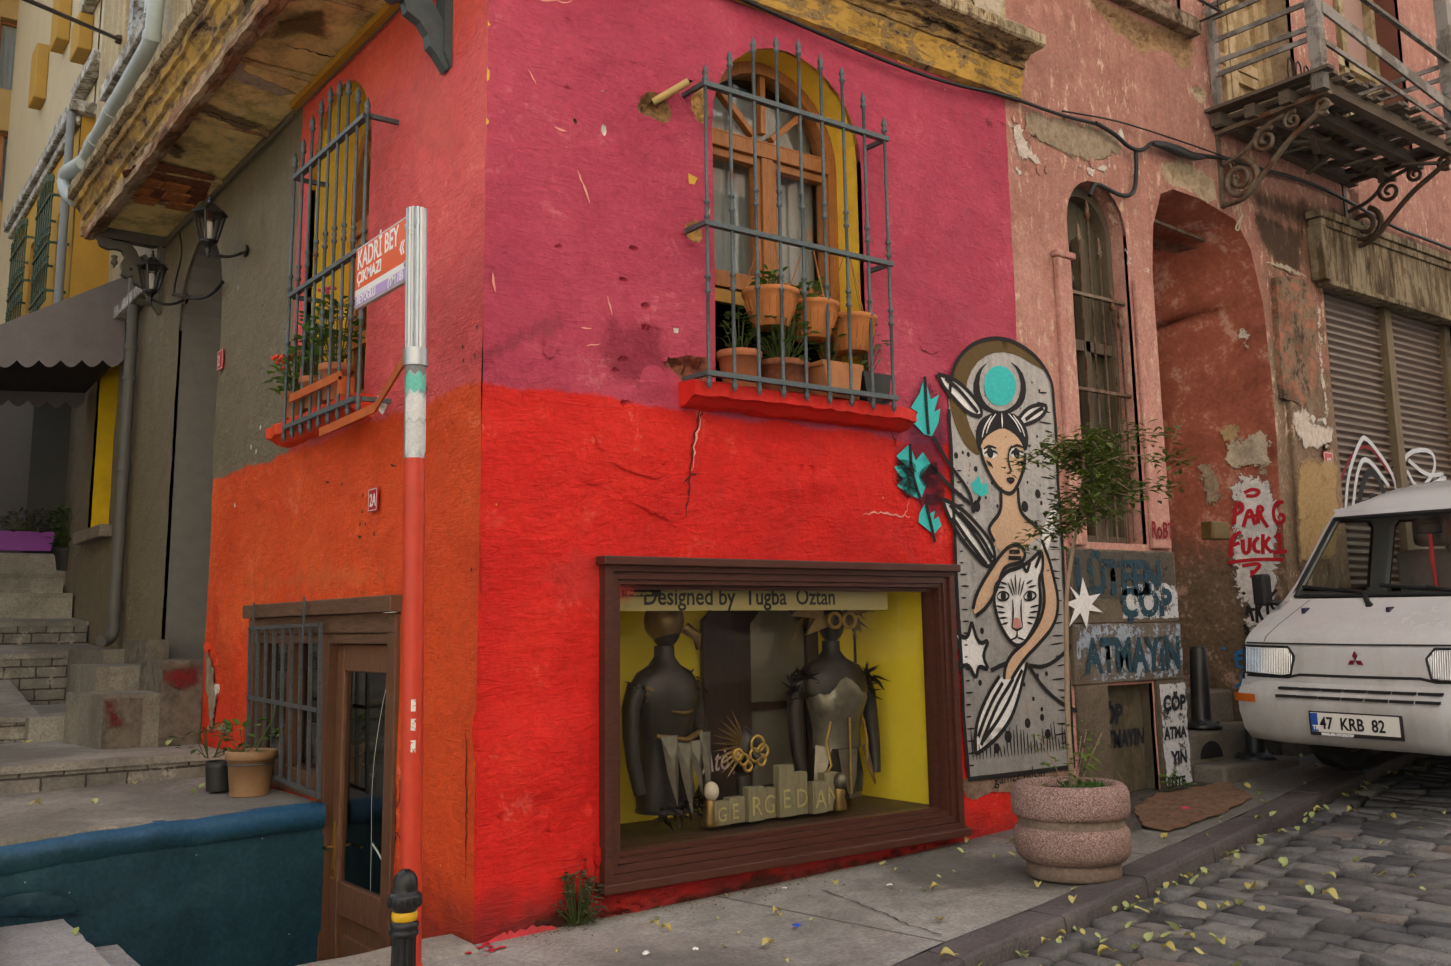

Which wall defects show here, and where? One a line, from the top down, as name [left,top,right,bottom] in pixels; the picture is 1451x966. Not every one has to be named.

flaking render [1010,110,1125,177]
crack [683,410,703,516]
spalling [1196,424,1273,506]
spalling [203,642,232,734]